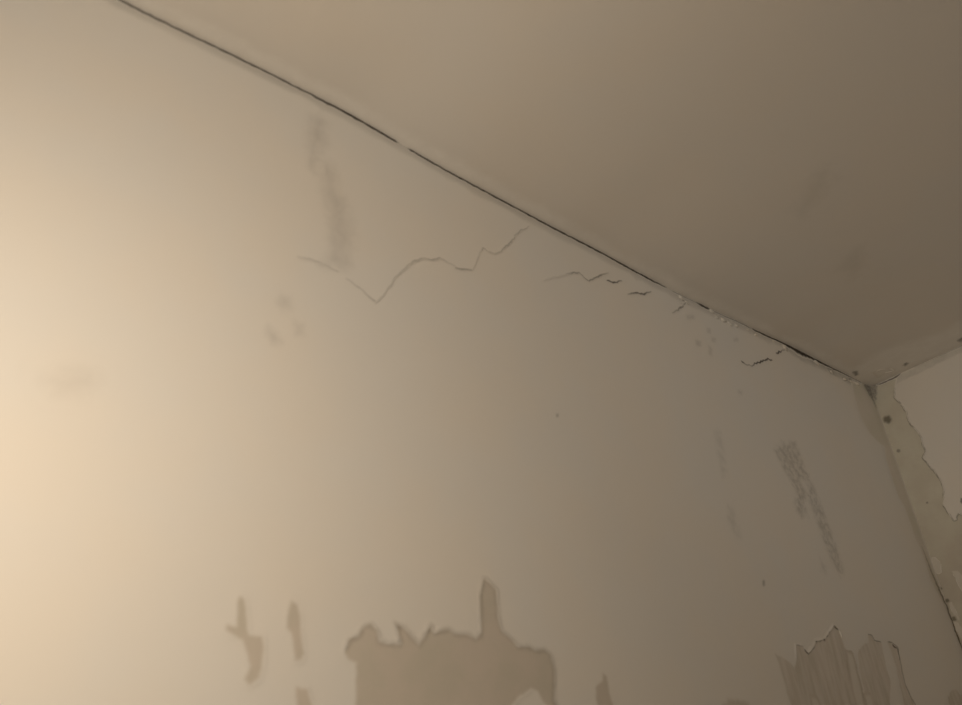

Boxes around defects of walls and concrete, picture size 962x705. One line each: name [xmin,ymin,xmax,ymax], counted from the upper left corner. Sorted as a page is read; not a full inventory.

crack [116,0,863,384]
peeling [850,378,962,655]
peeling [222,592,268,690]
peeling [283,596,308,665]
peeling [341,575,559,705]
peeling [773,622,916,705]